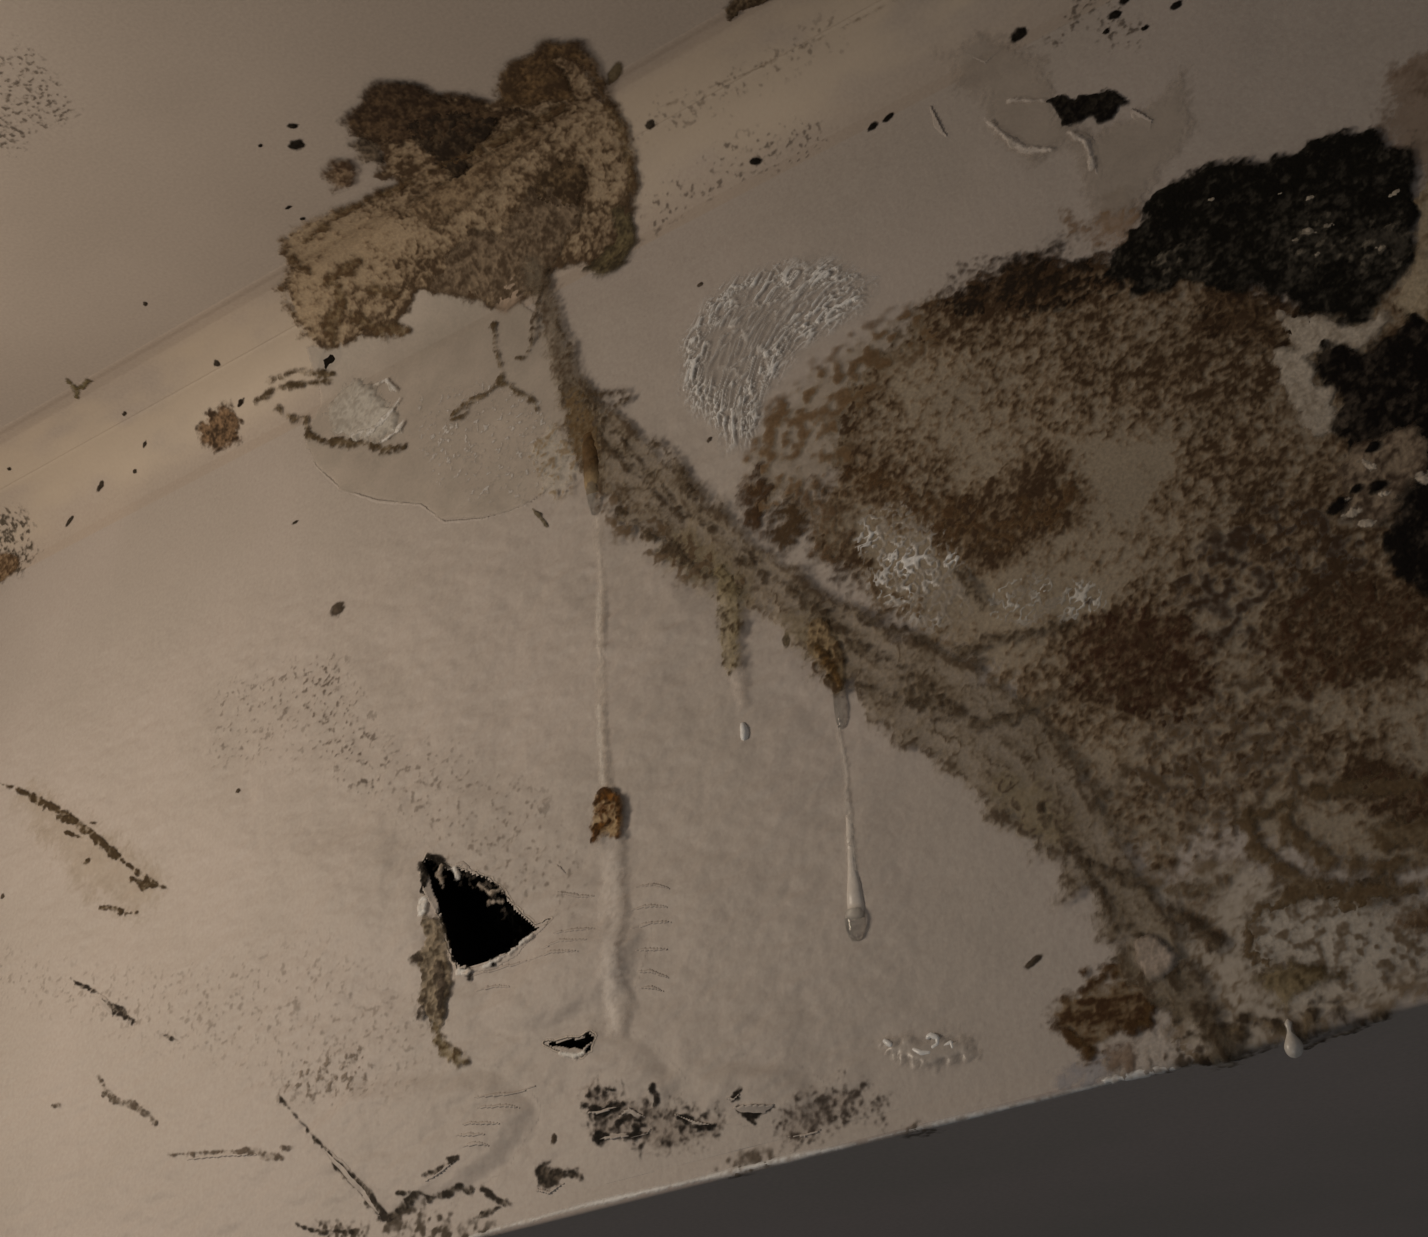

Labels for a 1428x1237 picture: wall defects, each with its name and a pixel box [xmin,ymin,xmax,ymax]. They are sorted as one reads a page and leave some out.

damp [1011,27,1026,43]
spalling [0,508,33,573]
damp [195,41,1428,1068]
rust [589,787,622,843]
crack [2,784,165,916]
peeling [581,1082,884,1149]
crack [98,1076,510,1235]
peeling [726,1150,772,1178]